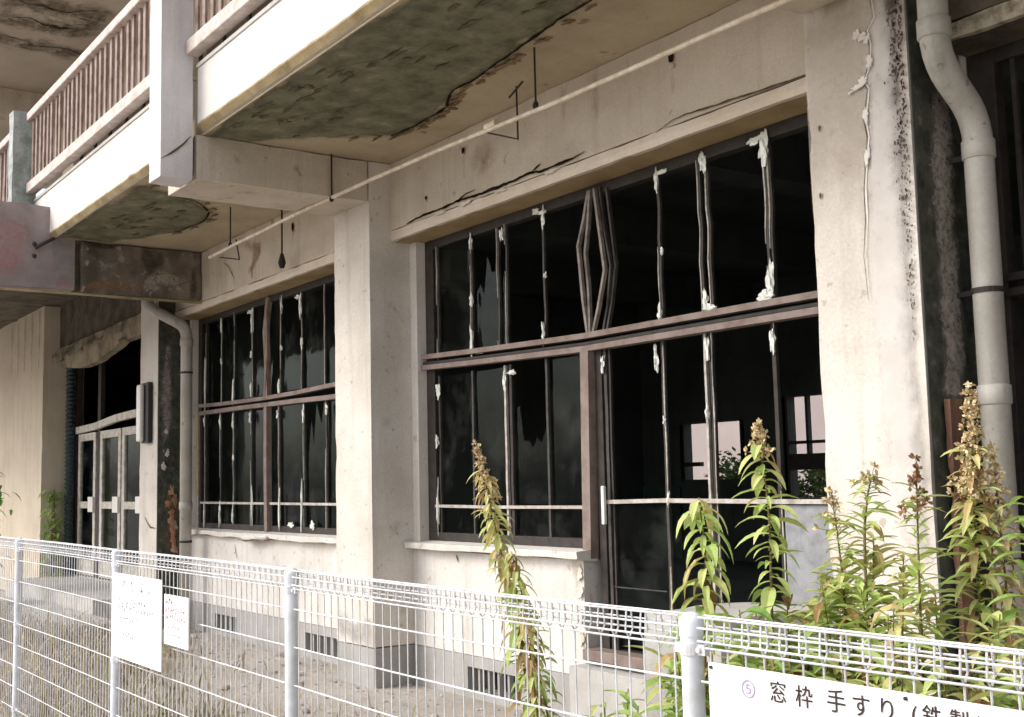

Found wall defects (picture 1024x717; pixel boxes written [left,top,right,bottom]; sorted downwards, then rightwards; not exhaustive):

flaking render [209,0,597,142]
crack [656,74,806,133]
flaking render [58,184,219,293]
crack [407,151,585,224]
leakage [879,0,916,341]